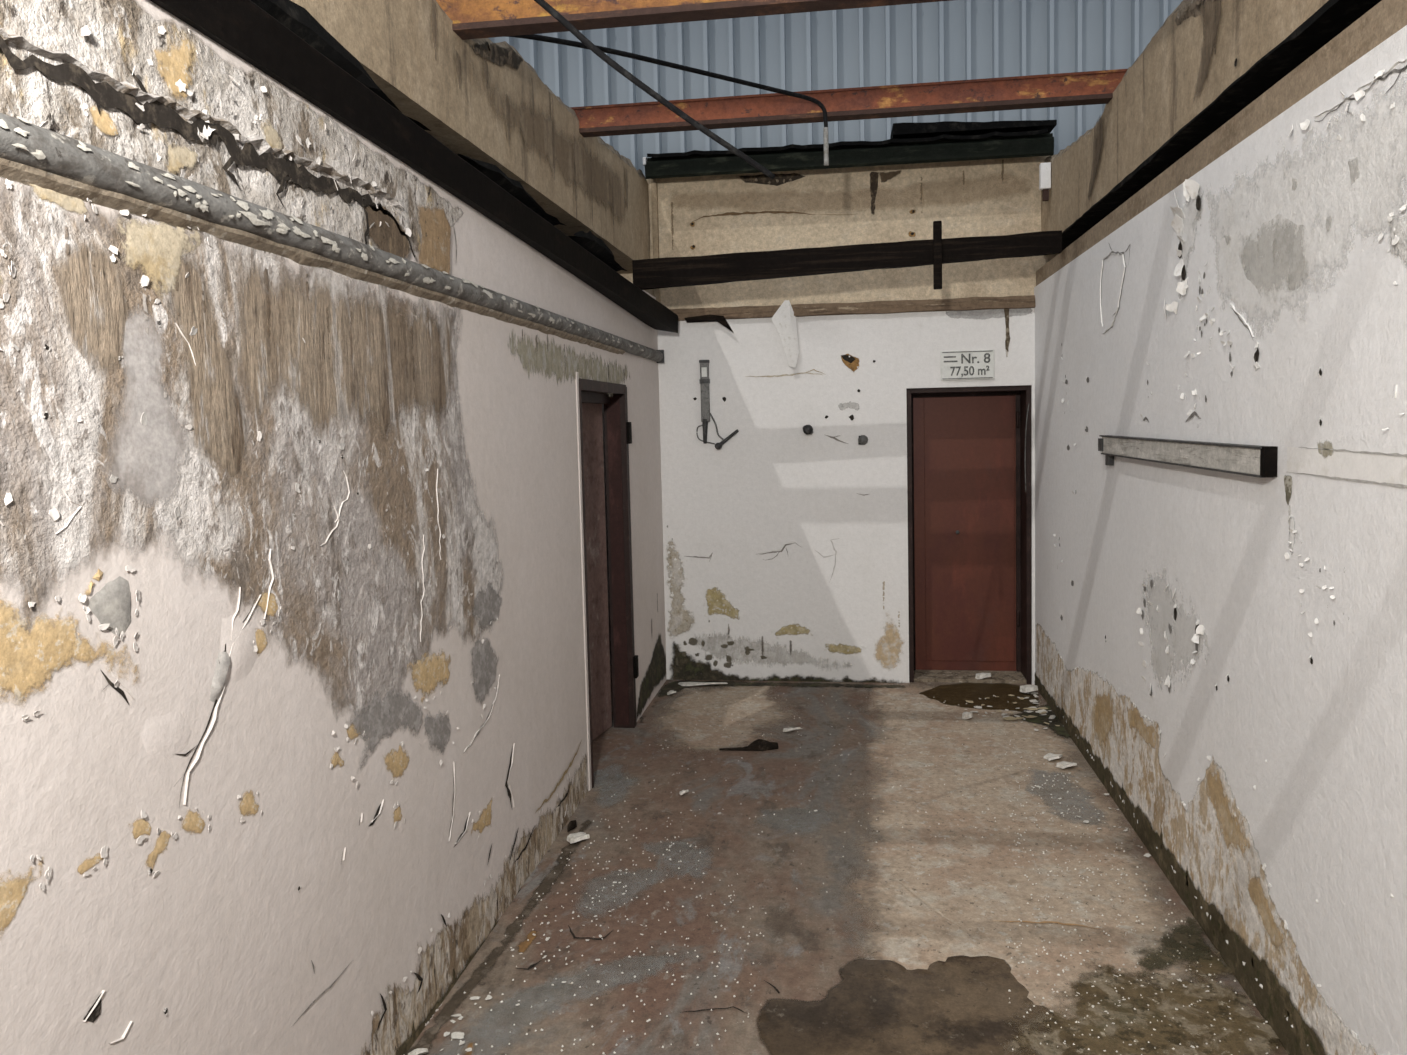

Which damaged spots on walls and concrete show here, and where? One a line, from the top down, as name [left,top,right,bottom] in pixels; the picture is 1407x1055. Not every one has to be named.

crack [0,25,415,258]
spalling [1175,0,1223,26]
flaking render [1164,78,1407,428]
crack [1288,59,1407,137]
flaking render [0,0,580,787]
peeling [702,581,739,622]
peeling [771,621,866,655]
peeling [0,854,52,931]
water stain [396,813,592,1055]
water stain [1009,673,1327,1055]
flaking render [1036,573,1404,1055]